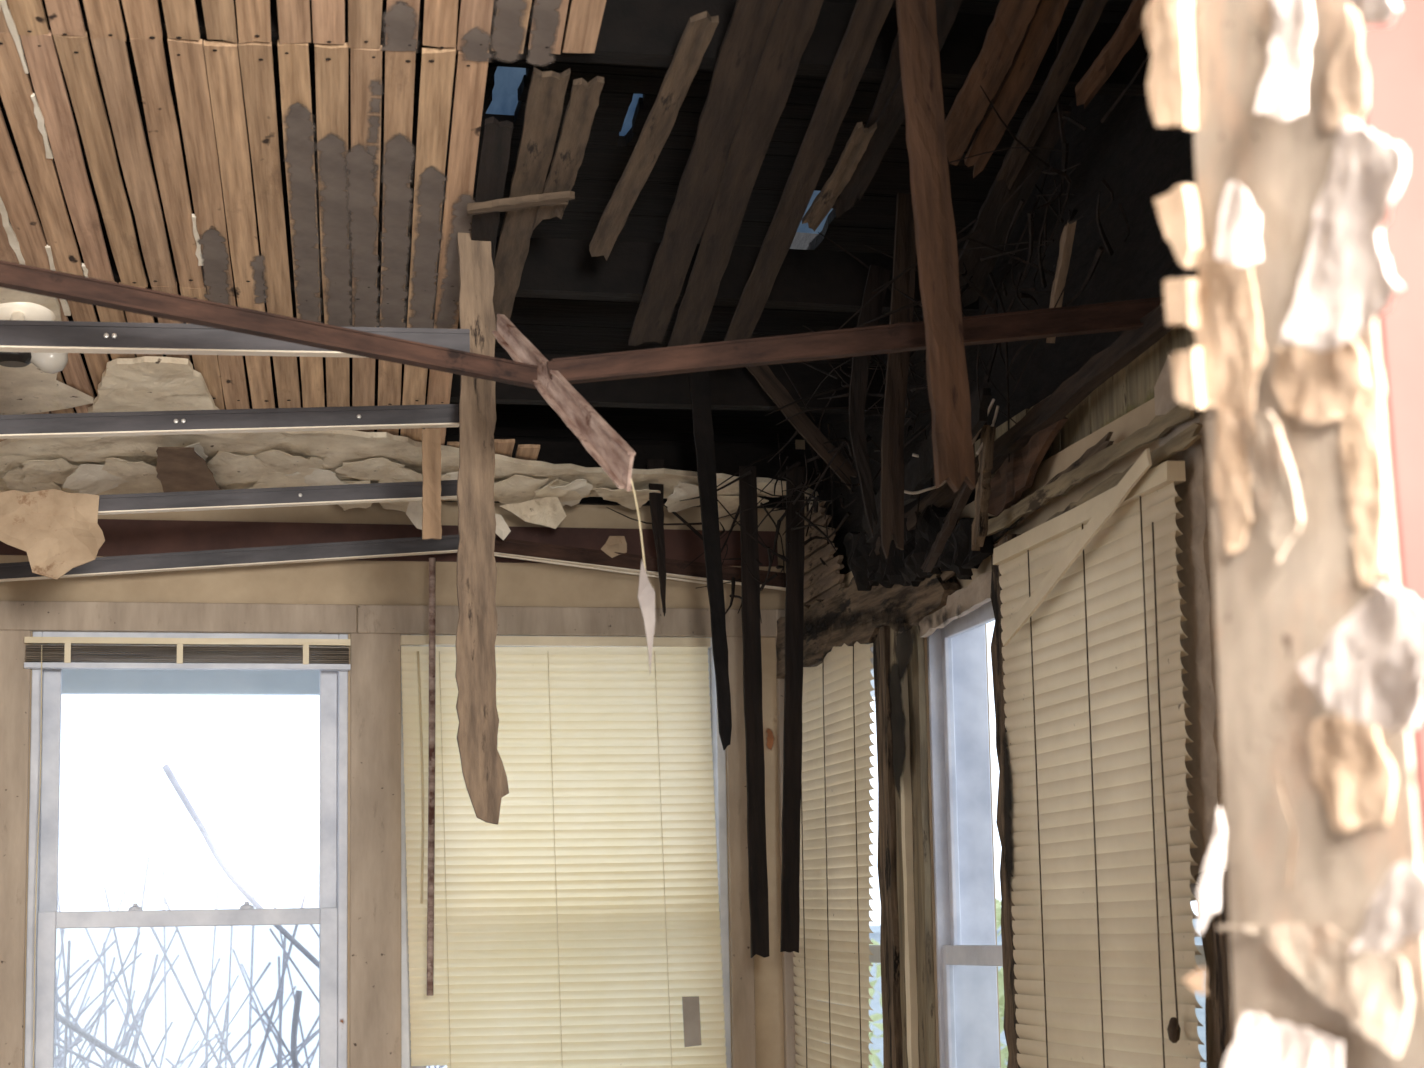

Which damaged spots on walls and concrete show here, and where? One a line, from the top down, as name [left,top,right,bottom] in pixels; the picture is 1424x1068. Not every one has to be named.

water stain [382,1,418,52]
water stain [461,0,562,66]
flaking render [1144,0,1198,129]
water stain [284,80,475,329]
flaking render [0,287,62,321]
flaking render [0,356,220,415]
peeling [1153,0,1424,833]
flaking render [0,430,423,495]
flaking render [494,454,700,540]
flaking render [716,473,739,517]
peeling [1198,808,1424,1057]
peeling [1223,1012,1343,1068]